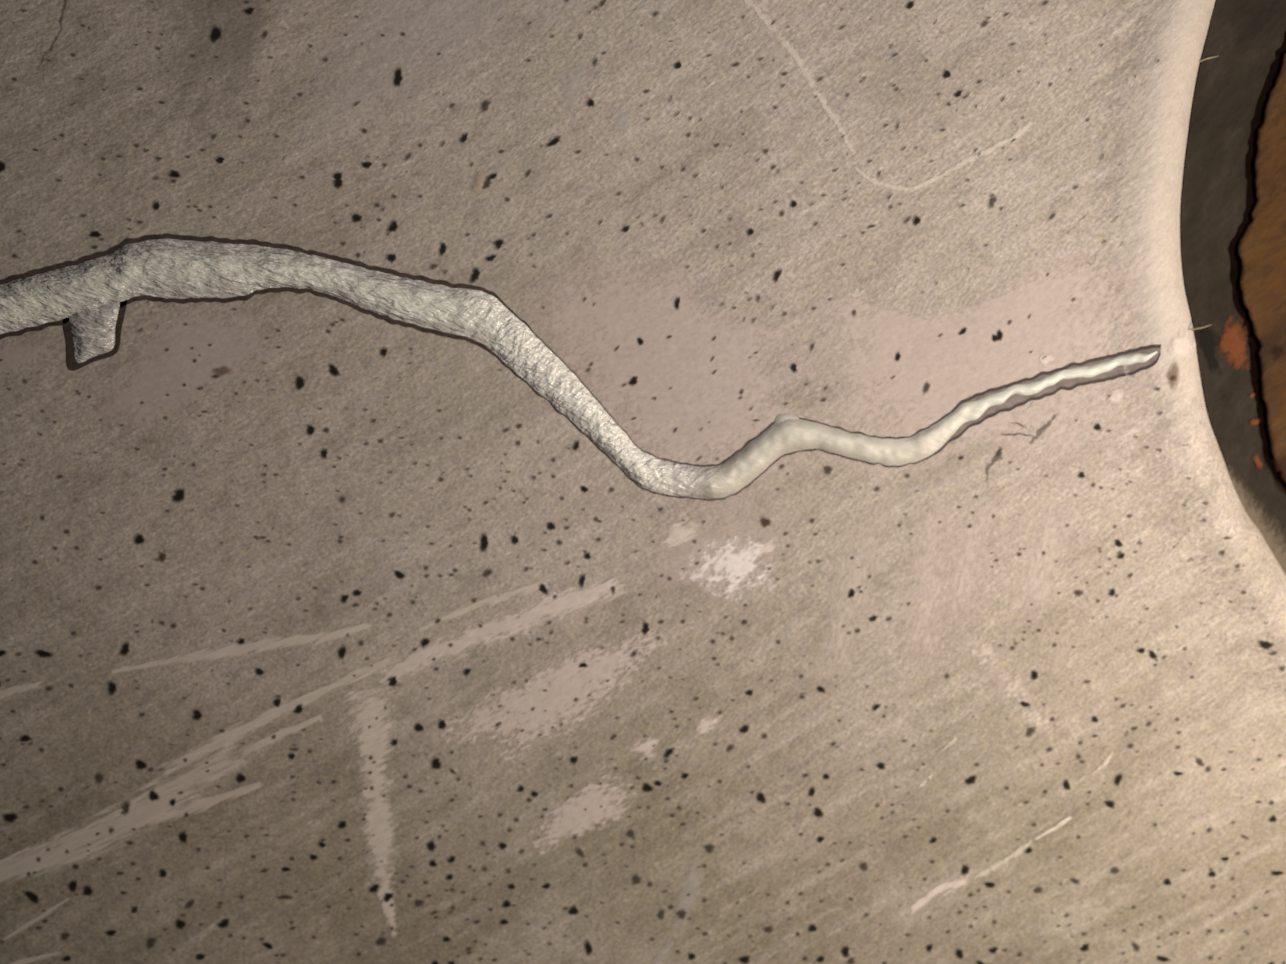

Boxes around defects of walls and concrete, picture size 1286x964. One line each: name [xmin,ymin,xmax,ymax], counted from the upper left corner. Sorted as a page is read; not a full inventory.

crack [0,234,1161,501]